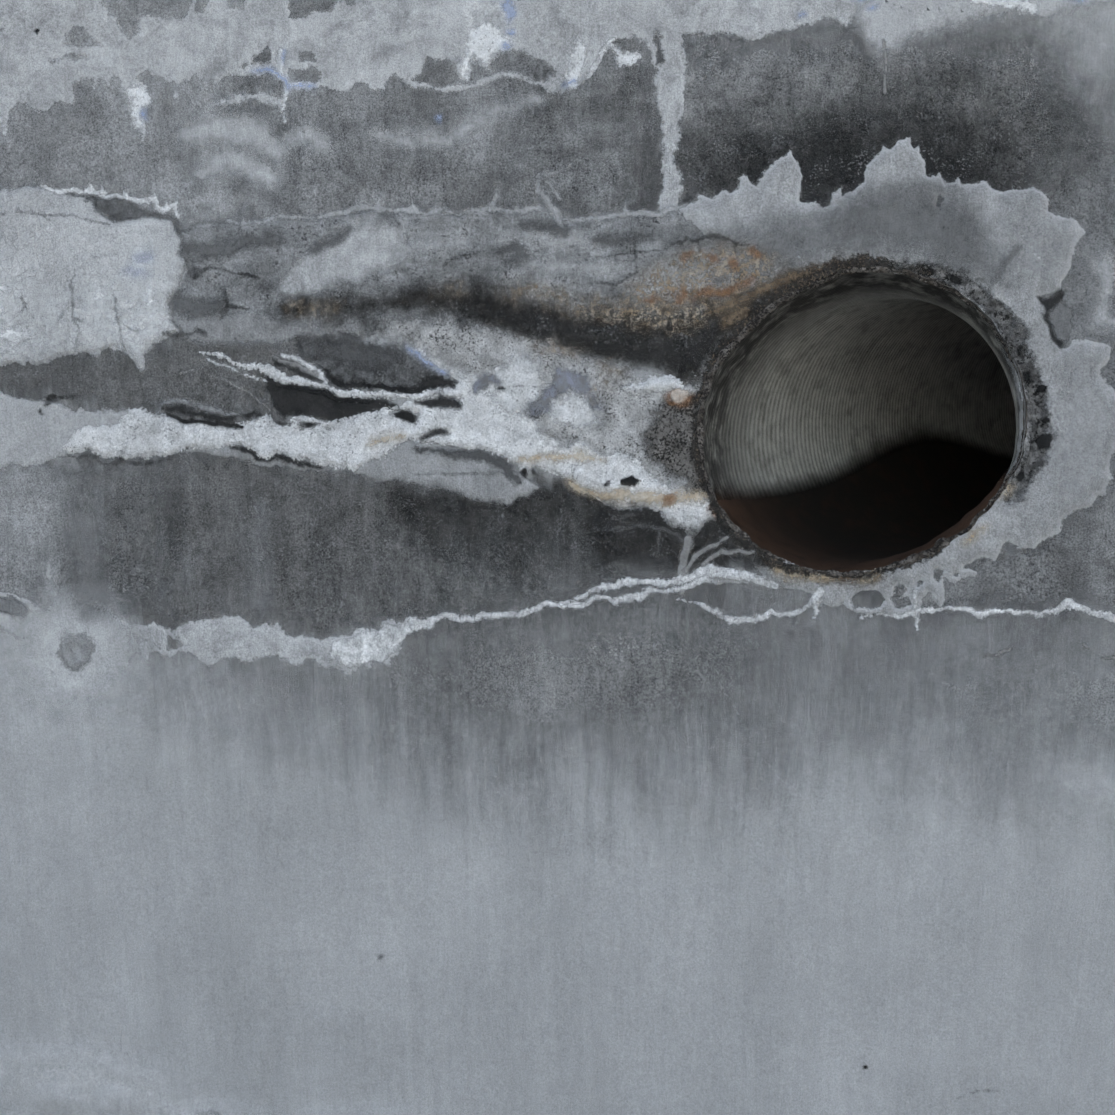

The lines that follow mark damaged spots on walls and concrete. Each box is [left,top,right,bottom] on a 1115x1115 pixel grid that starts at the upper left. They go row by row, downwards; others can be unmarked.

peeling [0,182,186,372]
leakage [0,0,1115,389]
corrosion [511,246,856,333]
spalling [891,261,1054,505]
spalling [1037,290,1073,347]
leakage [0,275,822,745]
corrosion [726,528,883,584]
leakage [859,453,1115,638]